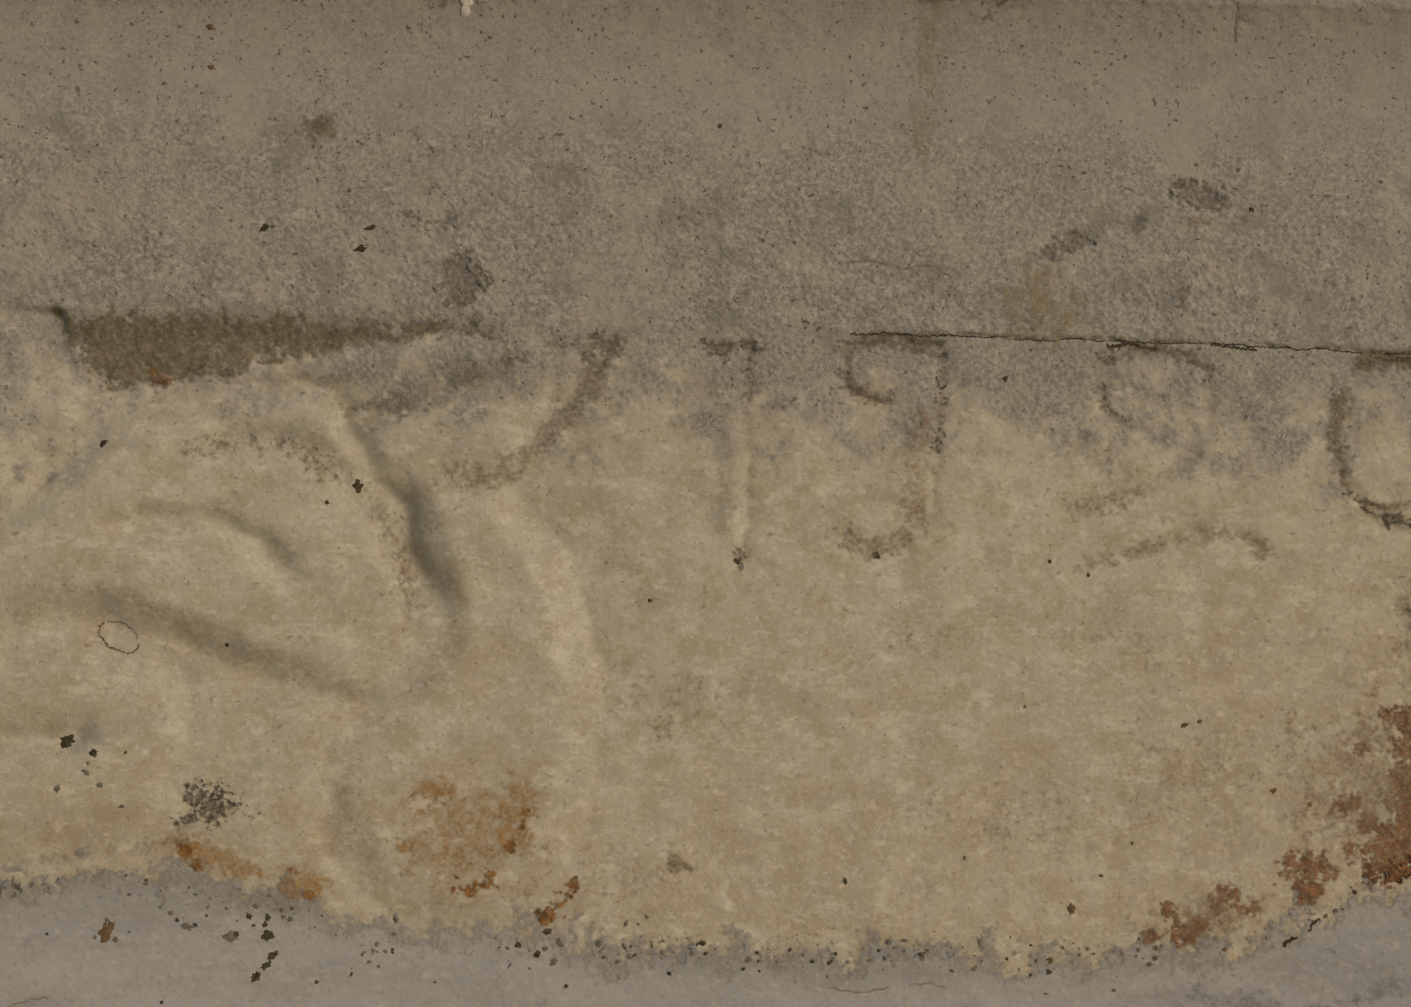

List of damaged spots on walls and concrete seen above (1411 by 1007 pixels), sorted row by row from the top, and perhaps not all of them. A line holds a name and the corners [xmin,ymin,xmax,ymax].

crack [851,331,1411,363]
corrosion [397,776,537,898]
corrosion [1141,687,1411,948]